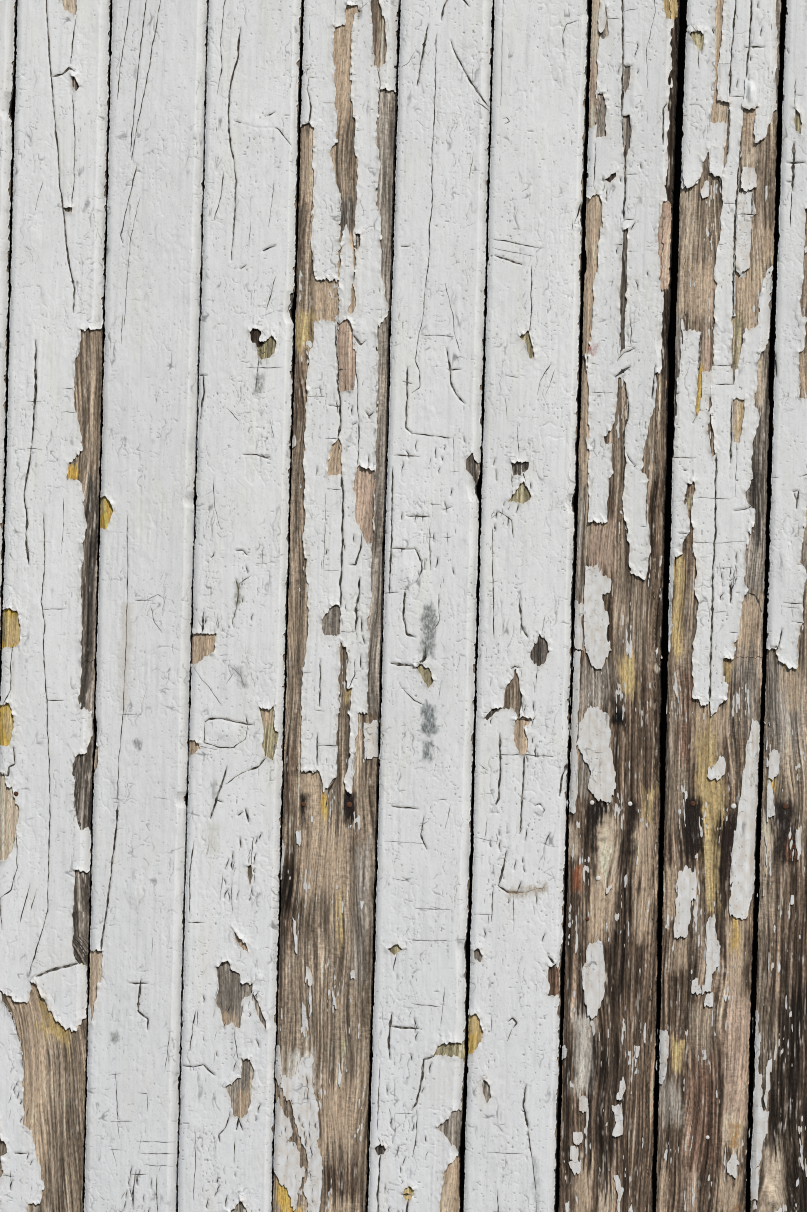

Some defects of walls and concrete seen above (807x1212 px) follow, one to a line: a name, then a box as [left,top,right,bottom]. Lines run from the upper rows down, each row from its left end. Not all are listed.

crack [35,0,77,311]
crack [214,0,336,268]
crack [200,374,238,420]
peeling [67,328,113,832]
peeling [216,0,402,1212]
crack [384,799,450,849]
peeling [485,669,532,754]
peeling [530,634,549,667]
peeling [548,0,807,1212]
peeling [0,870,103,1212]
crack [110,981,316,1212]